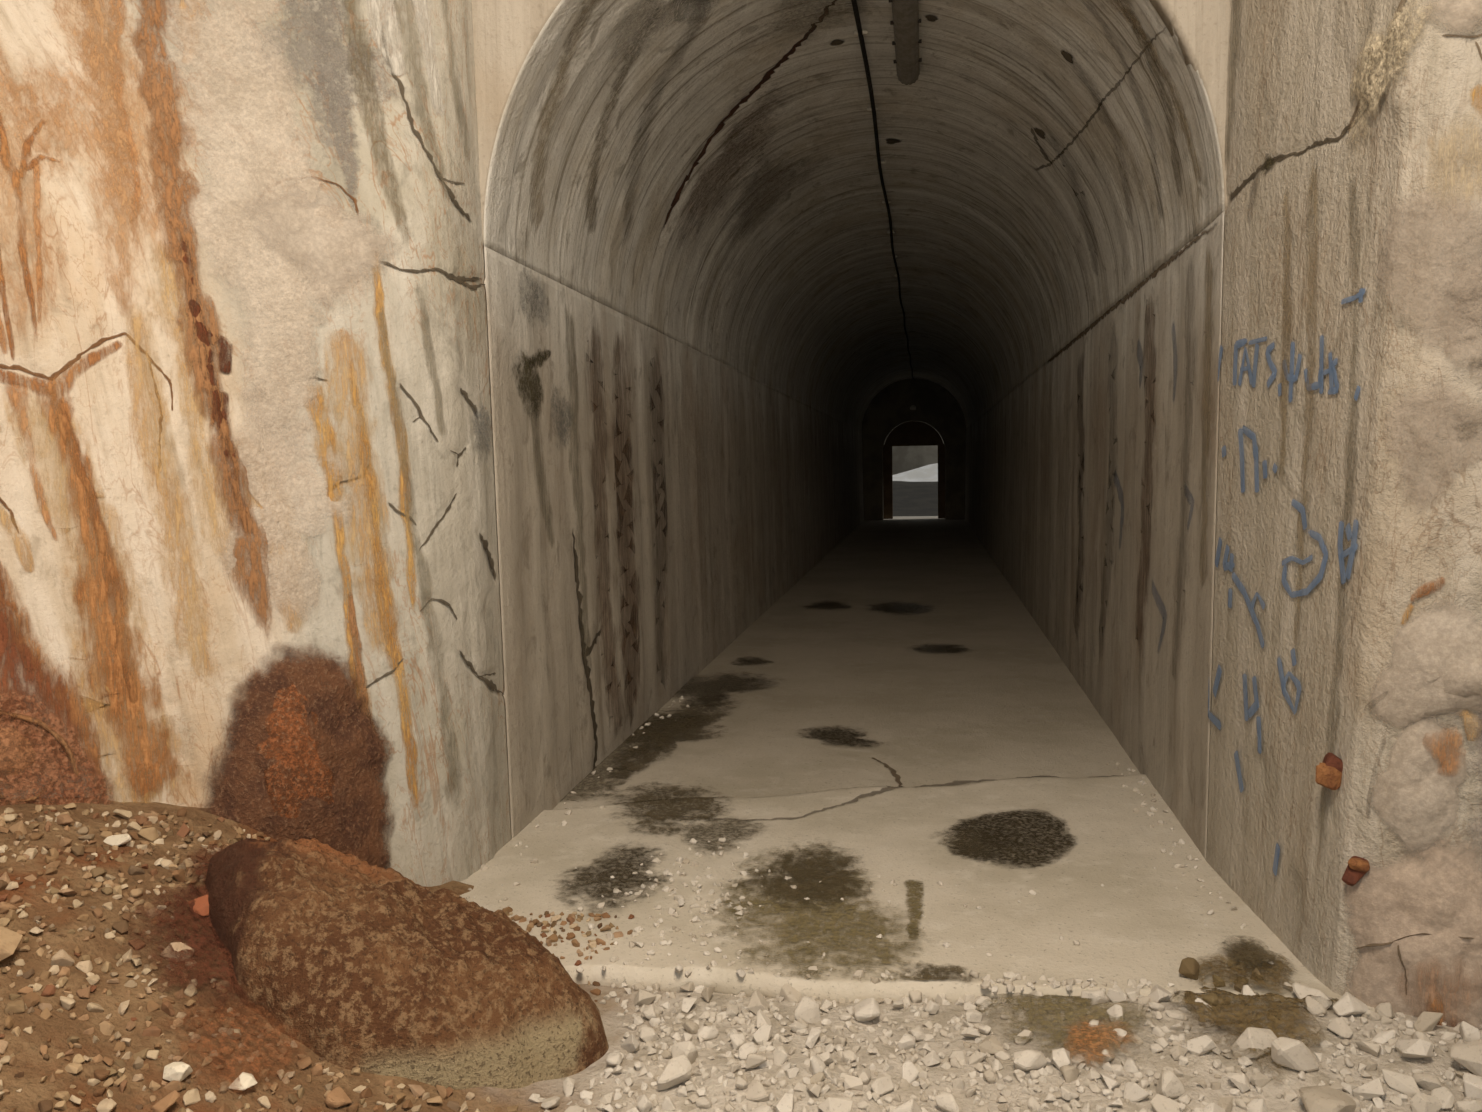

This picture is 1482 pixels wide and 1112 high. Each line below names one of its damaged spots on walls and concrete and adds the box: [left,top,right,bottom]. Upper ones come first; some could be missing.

crack [1031,31,1163,170]
spalling [1348,0,1482,138]
crack [1442,33,1482,59]
crack [0,332,173,466]
rust [0,0,299,672]
rust [0,384,177,803]
rust [307,255,418,801]
damp [562,846,667,908]
crack [644,757,1057,821]
damp [944,810,1074,868]